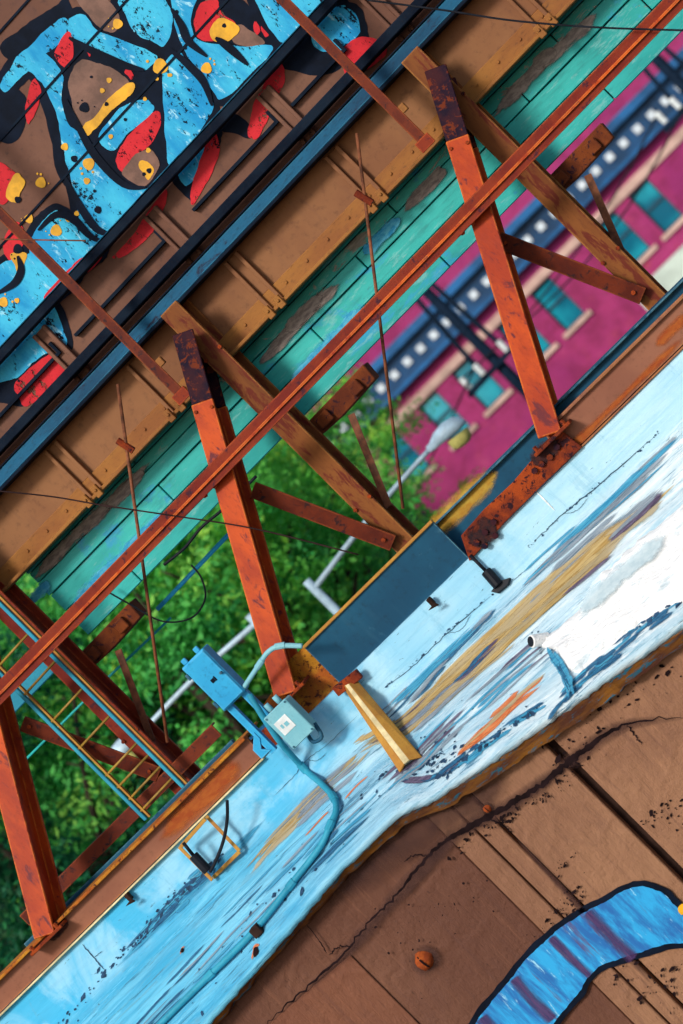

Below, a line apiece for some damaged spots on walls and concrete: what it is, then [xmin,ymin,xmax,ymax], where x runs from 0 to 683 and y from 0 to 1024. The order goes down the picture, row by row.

peeling [494,14,596,117]
peeling [363,166,447,255]
peeling [259,285,338,364]
rust [530,440,560,466]
rust [432,472,495,531]
rust [467,517,499,548]
rust [164,763,237,836]
crack [267,716,680,1024]